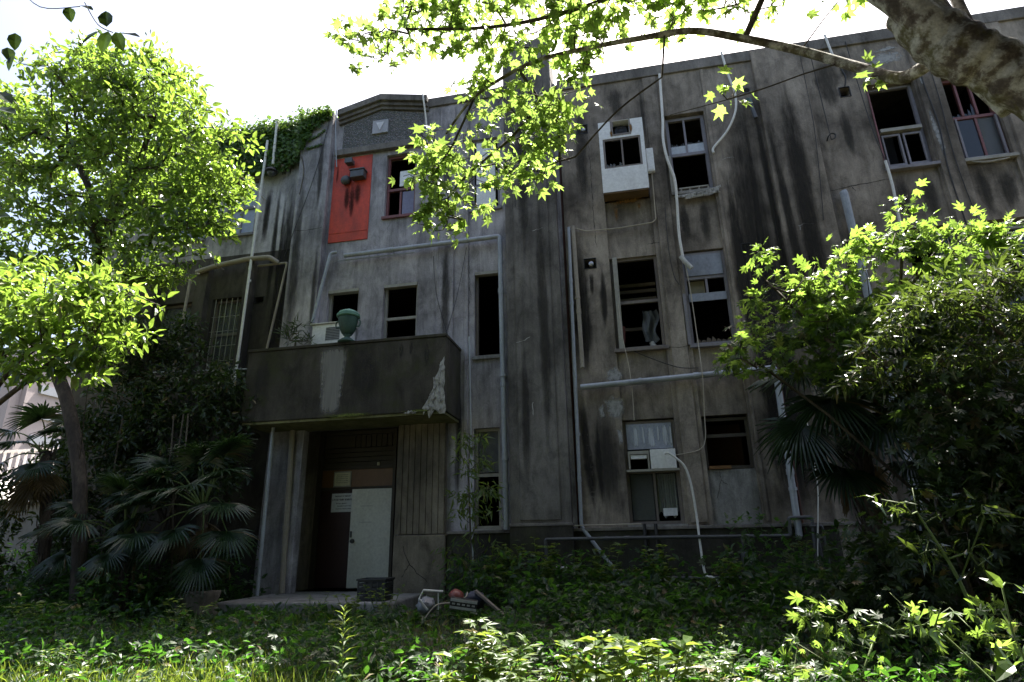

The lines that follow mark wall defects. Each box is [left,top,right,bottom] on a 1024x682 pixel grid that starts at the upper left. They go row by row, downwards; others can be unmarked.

water stain [815,56,848,102]
water stain [842,117,854,150]
water stain [336,170,360,214]
water stain [519,119,527,235]
water stain [263,195,302,348]
water stain [537,221,550,415]
water stain [728,106,828,486]
water stain [320,349,346,412]
spalling [405,357,446,418]